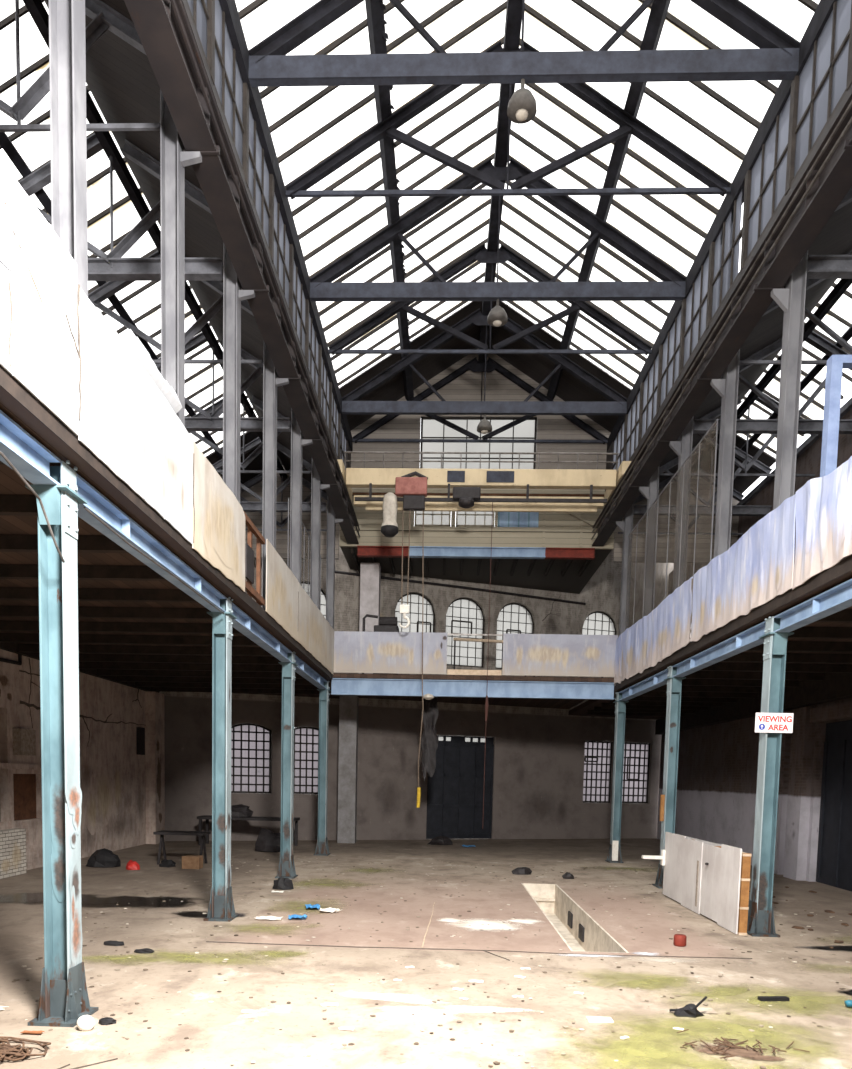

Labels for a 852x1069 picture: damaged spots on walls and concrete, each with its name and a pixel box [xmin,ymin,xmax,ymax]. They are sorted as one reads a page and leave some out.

crack [65,284,81,420]
corrosion [50,769,82,967]